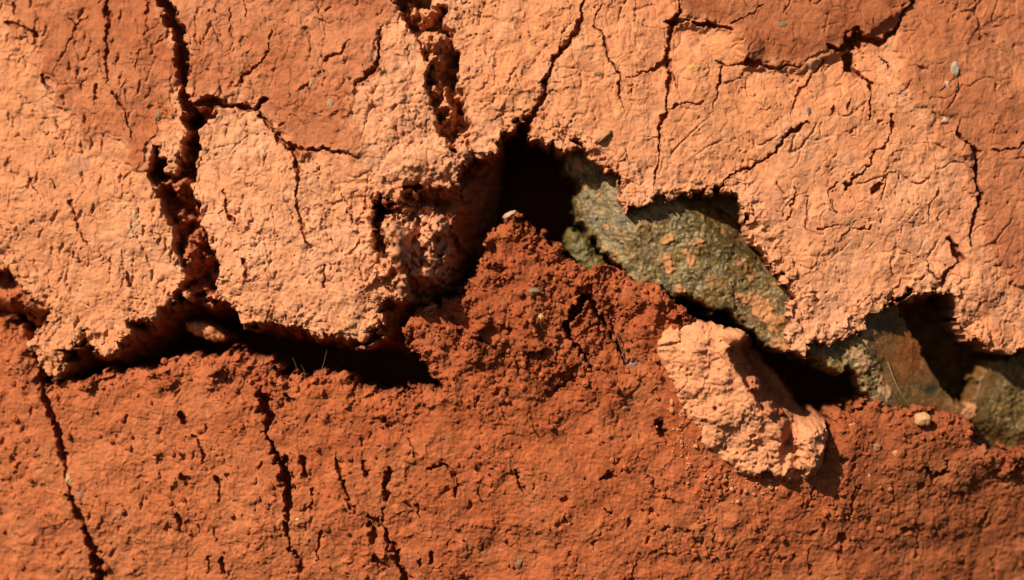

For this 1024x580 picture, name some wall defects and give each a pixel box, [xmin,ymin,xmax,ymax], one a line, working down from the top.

crack [40,0,369,289]
spalling [0,0,1024,407]
crack [516,0,930,231]
crack [973,0,984,42]
crack [24,322,111,580]
crack [254,386,485,580]
crack [513,468,528,494]
hole [653,418,672,443]
spalling [817,392,871,431]
spalling [888,404,1024,453]